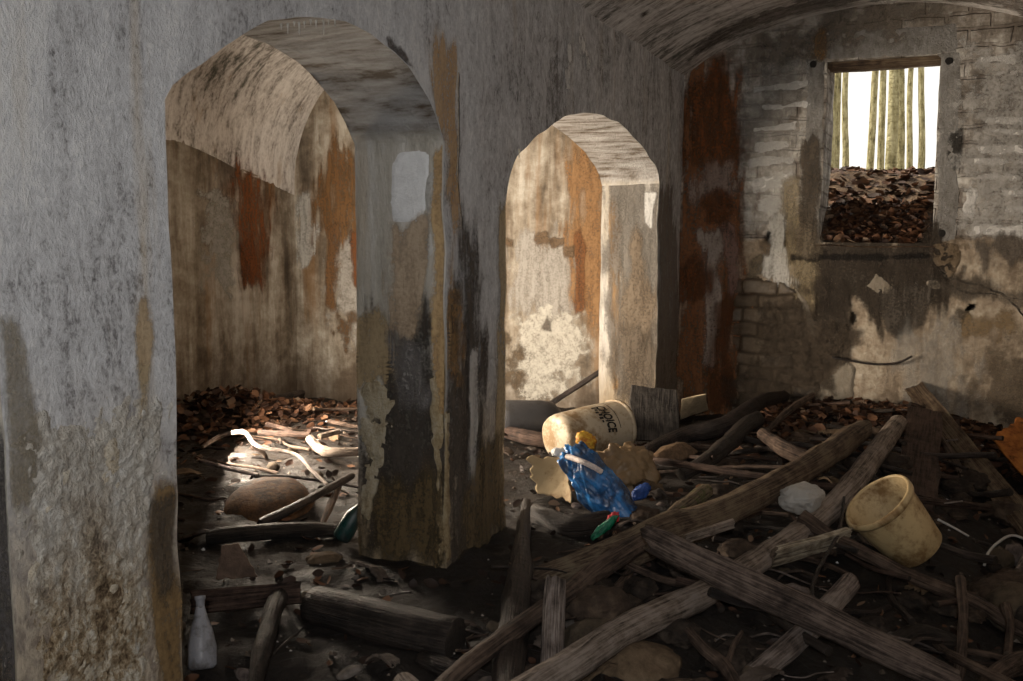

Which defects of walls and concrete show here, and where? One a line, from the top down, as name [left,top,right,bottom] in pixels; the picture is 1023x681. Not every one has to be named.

damp [0,320,39,681]
damp [148,481,182,681]
corrosion [229,153,276,290]
corrosion [310,133,357,311]
flaking render [358,379,395,520]
corrosion [431,34,465,414]
corrosion [559,149,620,337]
corrosion [676,55,760,416]
spalling [723,240,860,410]
damp [761,133,953,338]
damp [948,128,963,169]
damp [960,349,1023,424]